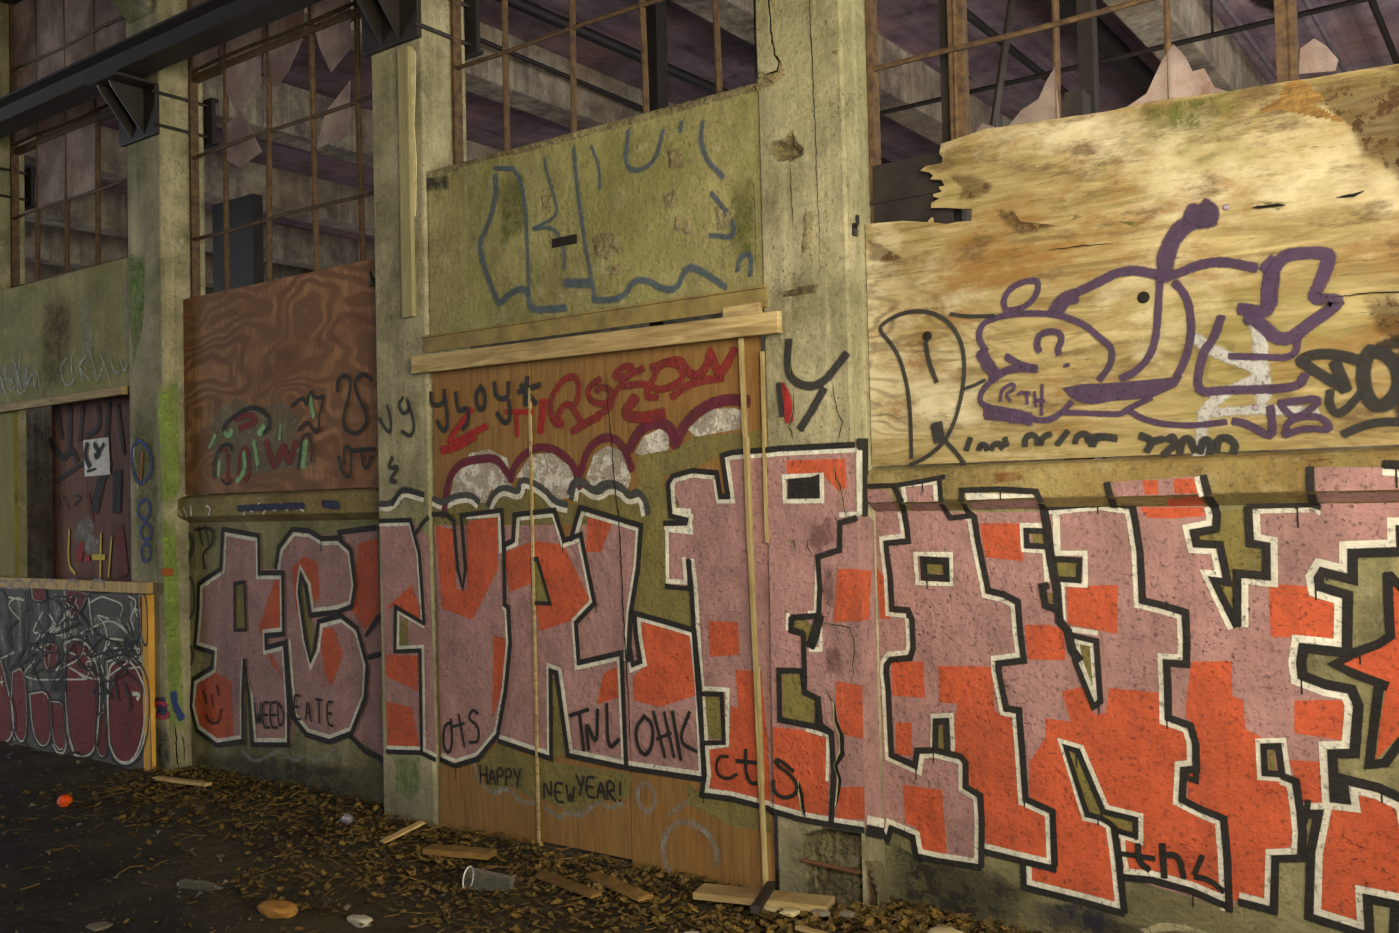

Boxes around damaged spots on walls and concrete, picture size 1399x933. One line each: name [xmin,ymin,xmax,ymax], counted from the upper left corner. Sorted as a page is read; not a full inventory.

damp [1250,0,1274,12]
spalling [411,47,785,217]
crack [759,0,820,261]
spalling [768,130,803,161]
crack [1336,190,1363,198]
crack [1252,202,1285,210]
crack [1050,242,1113,250]
crack [1337,290,1399,298]
damp [135,384,183,767]